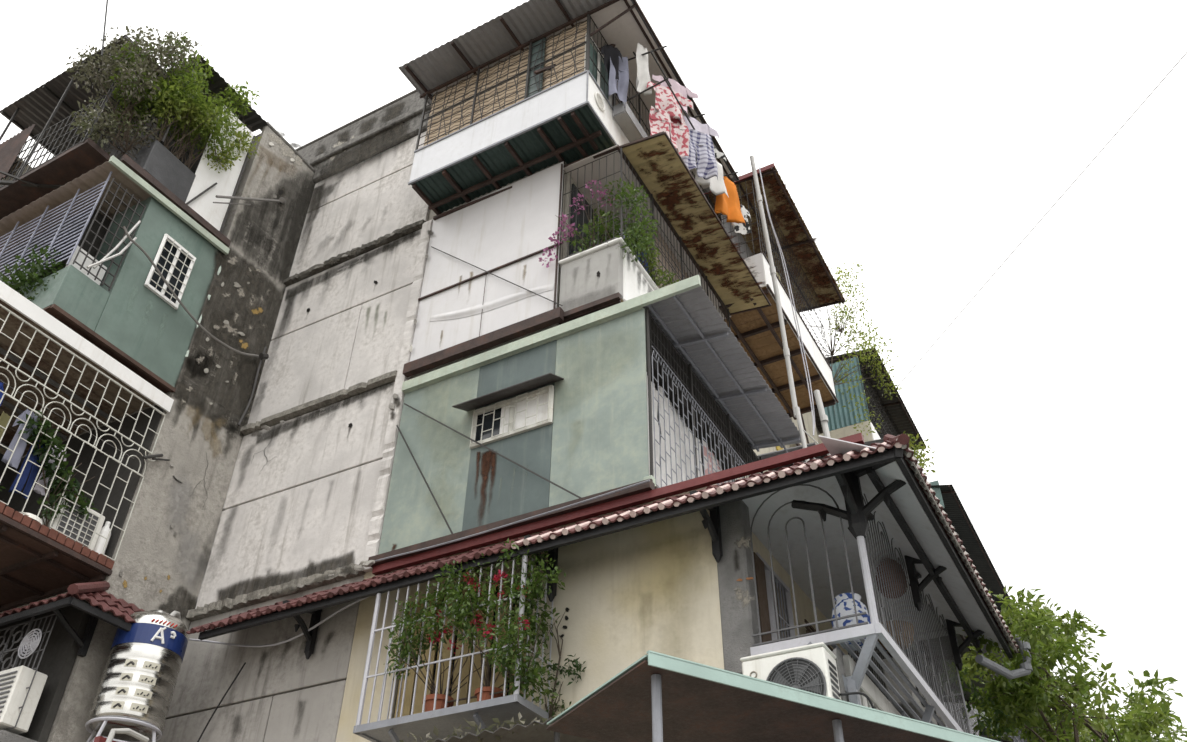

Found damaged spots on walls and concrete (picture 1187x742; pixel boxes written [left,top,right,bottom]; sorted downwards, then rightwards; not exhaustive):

water stain [173,103,419,449]
corrosion [638,143,774,303]
corrosion [760,168,841,303]
corrosion [475,451,496,516]